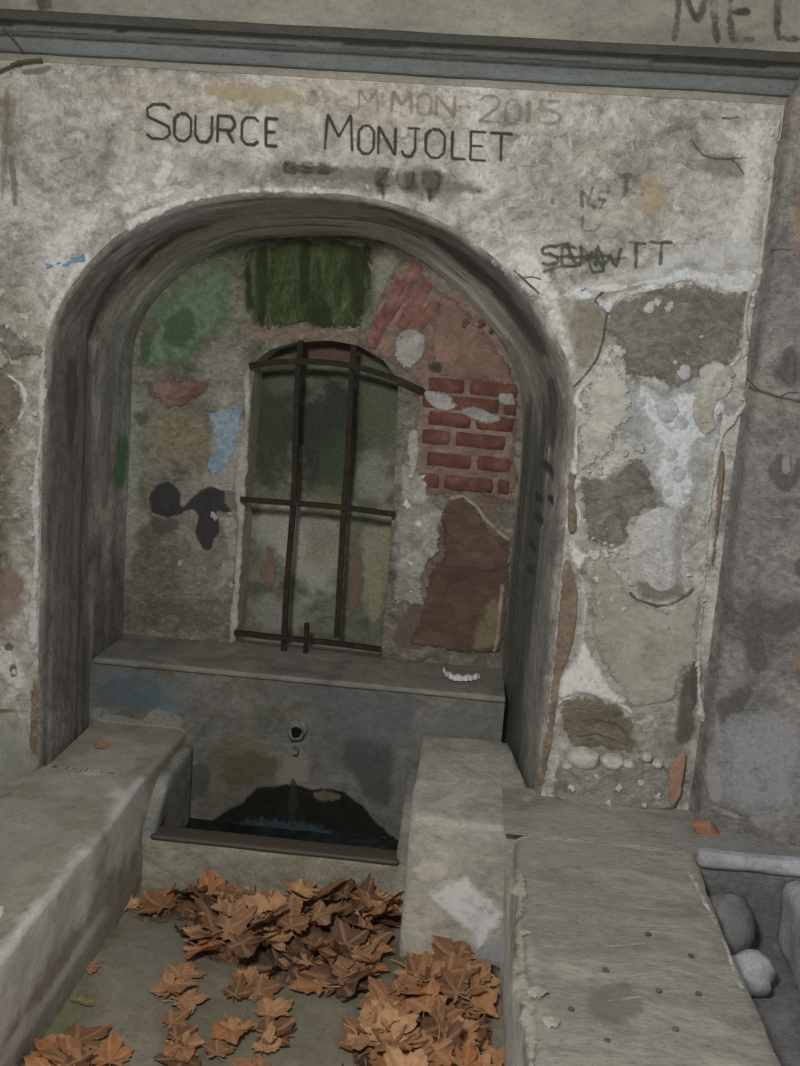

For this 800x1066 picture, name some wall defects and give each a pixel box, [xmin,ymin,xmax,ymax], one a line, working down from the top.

flaking render [604,278,755,388]
flaking render [0,373,38,433]
flaking render [365,261,518,653]
flaking render [567,445,658,552]
flaking render [711,451,725,566]
flaking render [537,560,686,810]